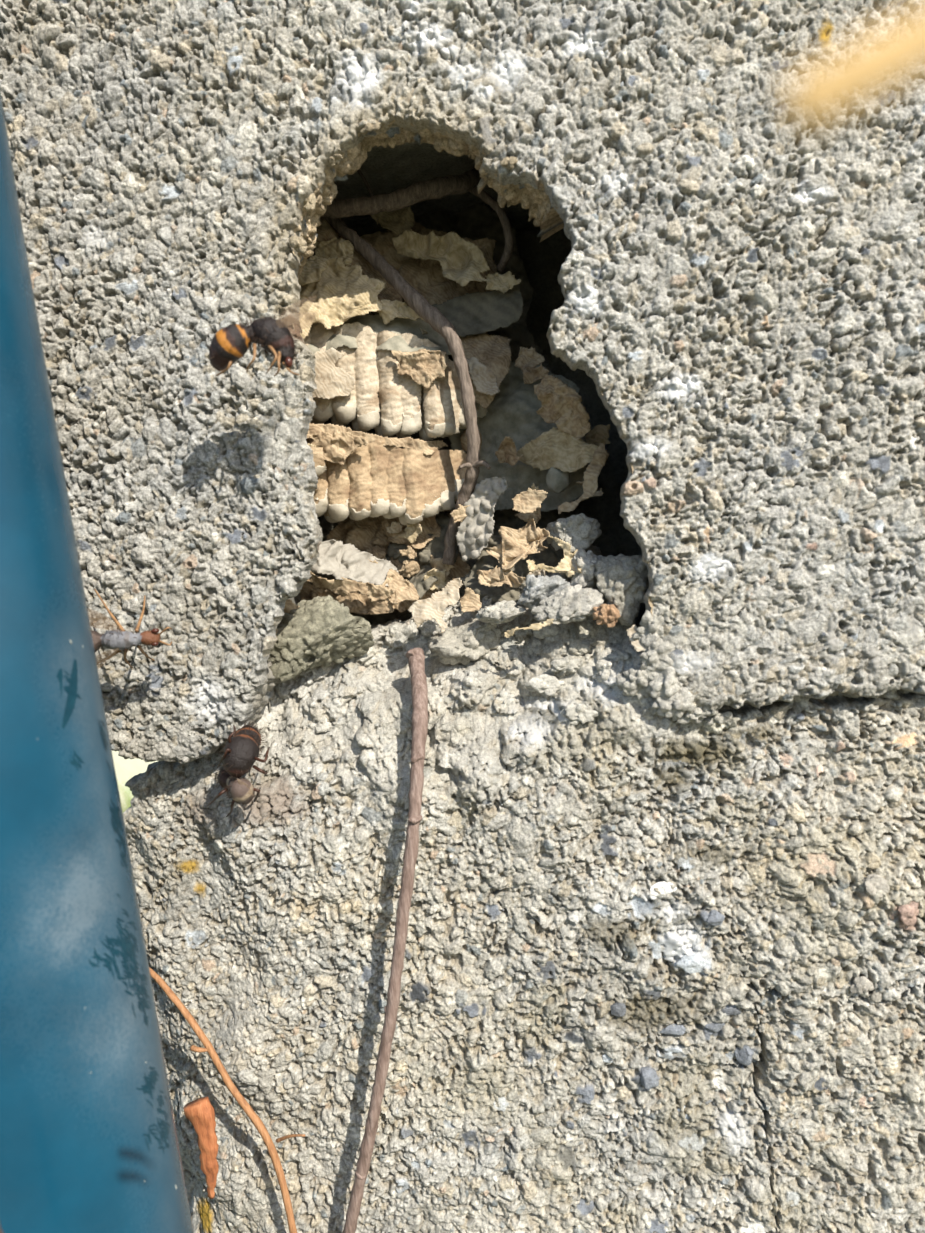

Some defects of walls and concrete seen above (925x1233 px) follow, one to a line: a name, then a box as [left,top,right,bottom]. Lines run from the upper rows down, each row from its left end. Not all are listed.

spalling [289,120,564,280]
spalling [240,581,733,807]
crack [718,666,925,713]
crack [857,863,925,1006]
crack [726,929,783,1233]